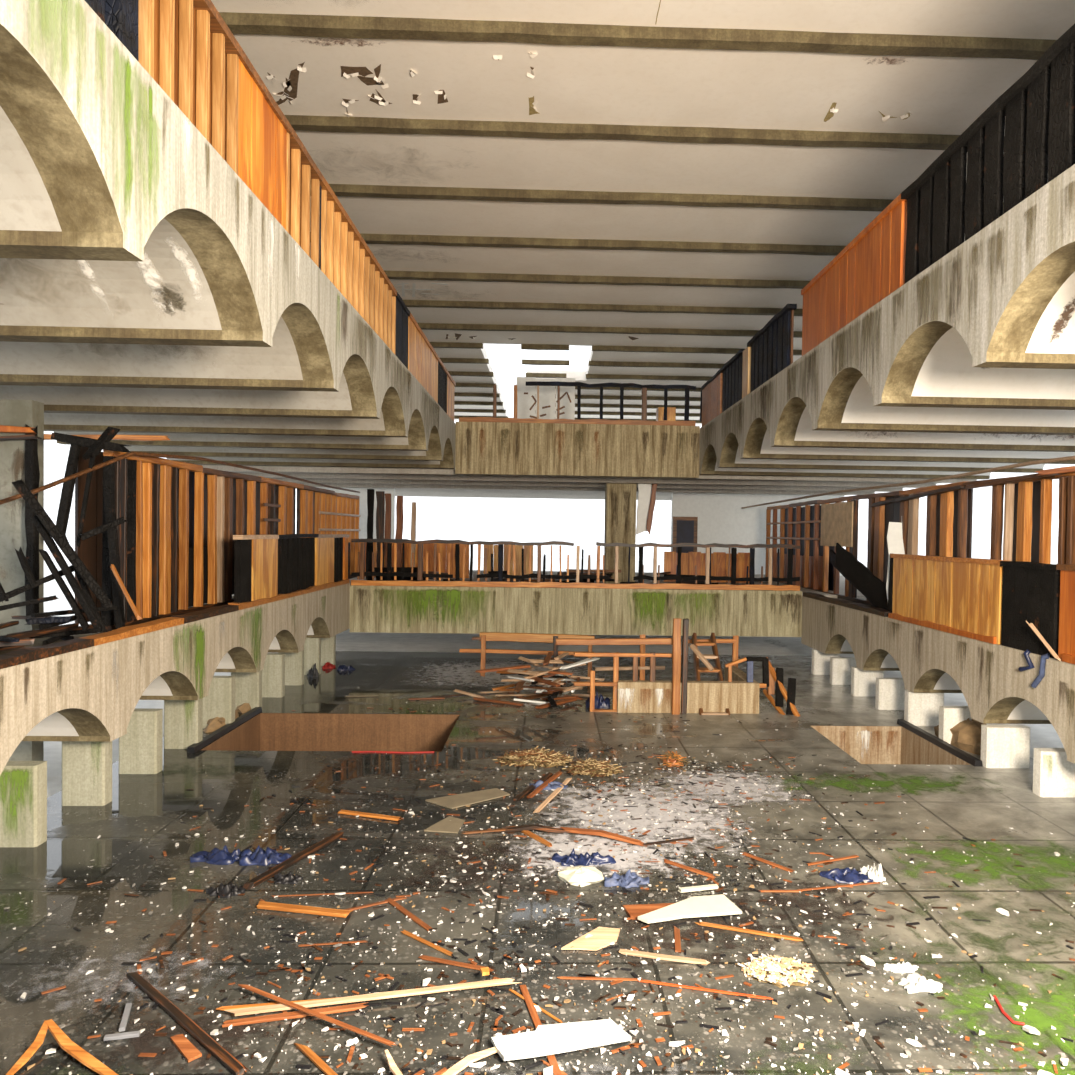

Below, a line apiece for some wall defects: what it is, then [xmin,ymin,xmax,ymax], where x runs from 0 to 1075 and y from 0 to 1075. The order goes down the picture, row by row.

water stain [97,32,159,190]
peeling [266,62,306,105]
peeling [341,64,392,118]
peeling [434,90,448,104]
spalling [155,286,185,312]
water stain [832,312,878,372]
water stain [917,230,1002,320]
peeling [1051,299,1075,342]
water stain [379,589,496,621]
water stain [633,592,719,628]
water stain [173,624,205,699]
water stain [980,649,993,705]